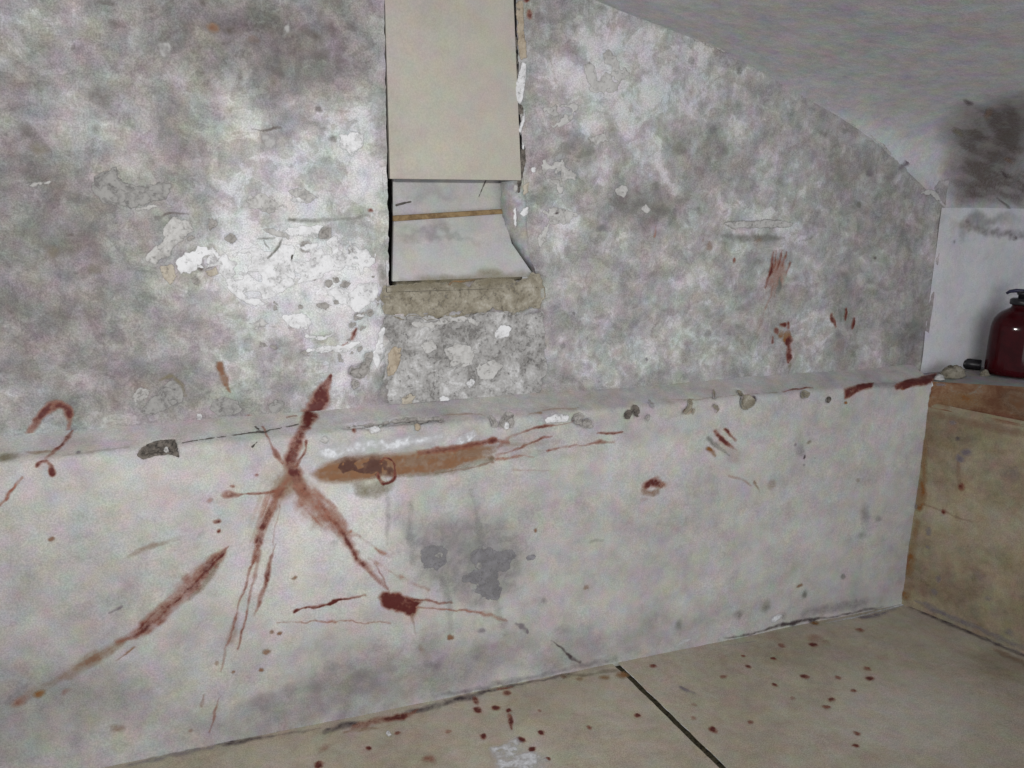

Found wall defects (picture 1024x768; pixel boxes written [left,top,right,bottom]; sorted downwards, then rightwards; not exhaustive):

leakage [955,101,1024,203]
spalling [91,167,548,405]
leakage [223,374,492,644]